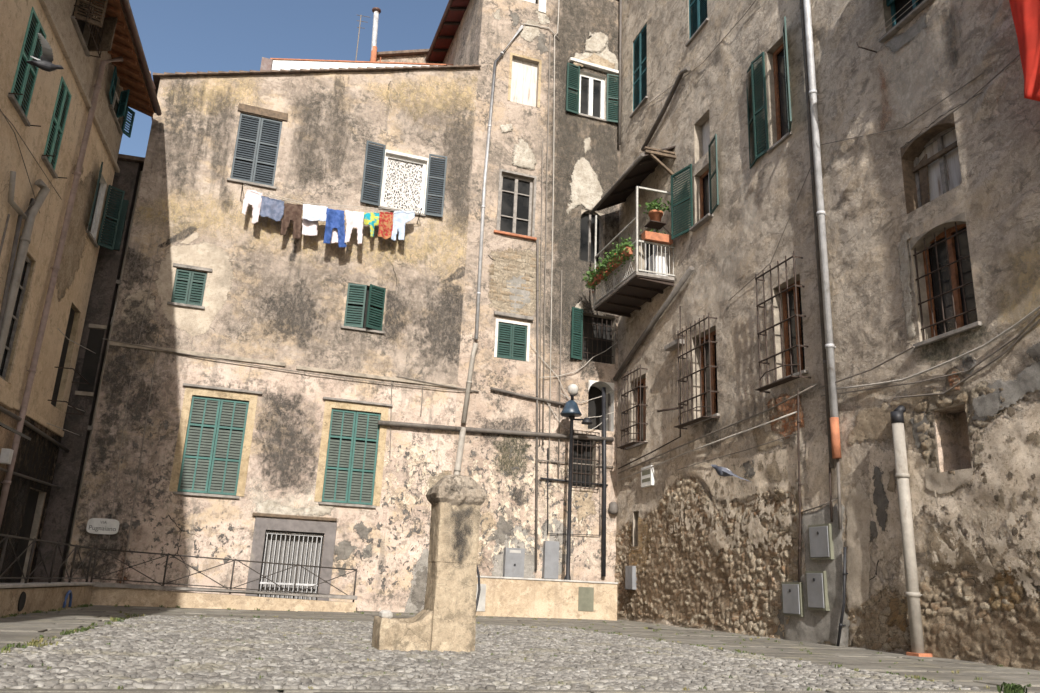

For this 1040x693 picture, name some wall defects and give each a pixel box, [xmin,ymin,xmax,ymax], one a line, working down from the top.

damp [138,78,472,270]
damp [68,516,127,582]
damp [80,296,164,499]
damp [261,281,326,348]
damp [255,393,335,519]
damp [385,282,463,364]
flaking render [664,390,844,560]
flaking render [847,354,1040,601]